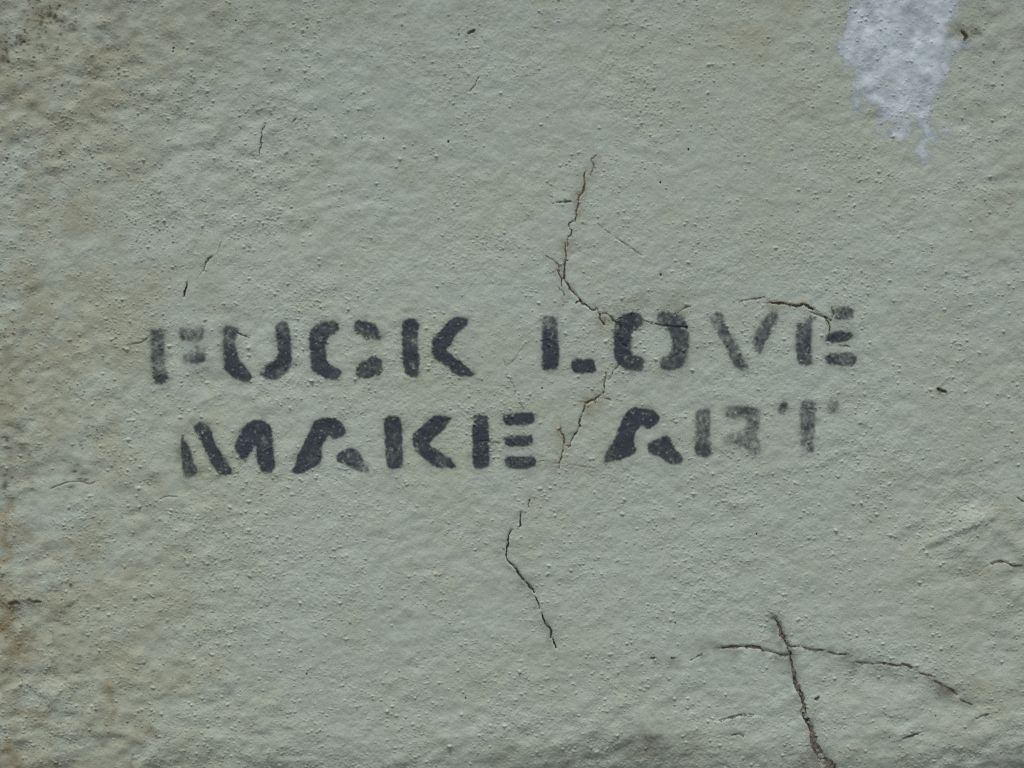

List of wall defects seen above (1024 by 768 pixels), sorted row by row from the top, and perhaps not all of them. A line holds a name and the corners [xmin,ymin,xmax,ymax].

crack [536,155,691,469]
crack [739,296,849,347]
crack [502,499,556,648]
crack [650,619,988,768]